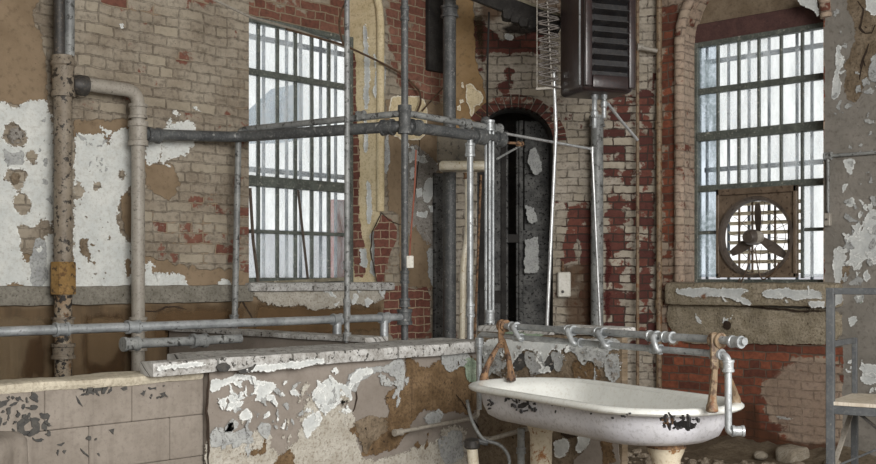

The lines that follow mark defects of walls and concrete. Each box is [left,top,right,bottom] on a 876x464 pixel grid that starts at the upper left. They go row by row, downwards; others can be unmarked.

peeling [353,24,427,124]
spalling [831,0,876,114]
peeling [0,99,54,286]
peeling [73,125,131,286]
peeling [253,132,439,339]
peeling [762,113,876,308]
peeling [676,287,752,306]
peeling [0,392,66,456]
peeling [76,386,127,407]
spalling [157,337,623,464]
peeling [845,359,876,393]